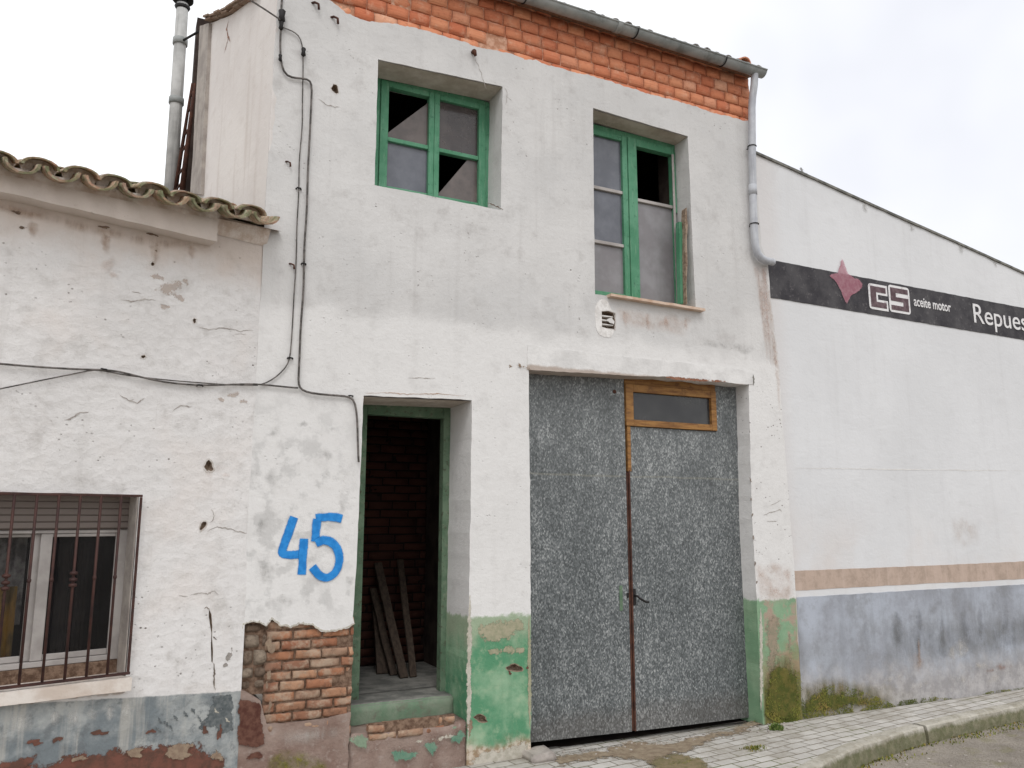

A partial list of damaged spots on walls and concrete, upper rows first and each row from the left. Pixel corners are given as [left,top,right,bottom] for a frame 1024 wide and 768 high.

spalling [202,458,215,473]
peeling [478,618,529,675]
spalling [0,610,488,768]
spalling [471,741,528,765]